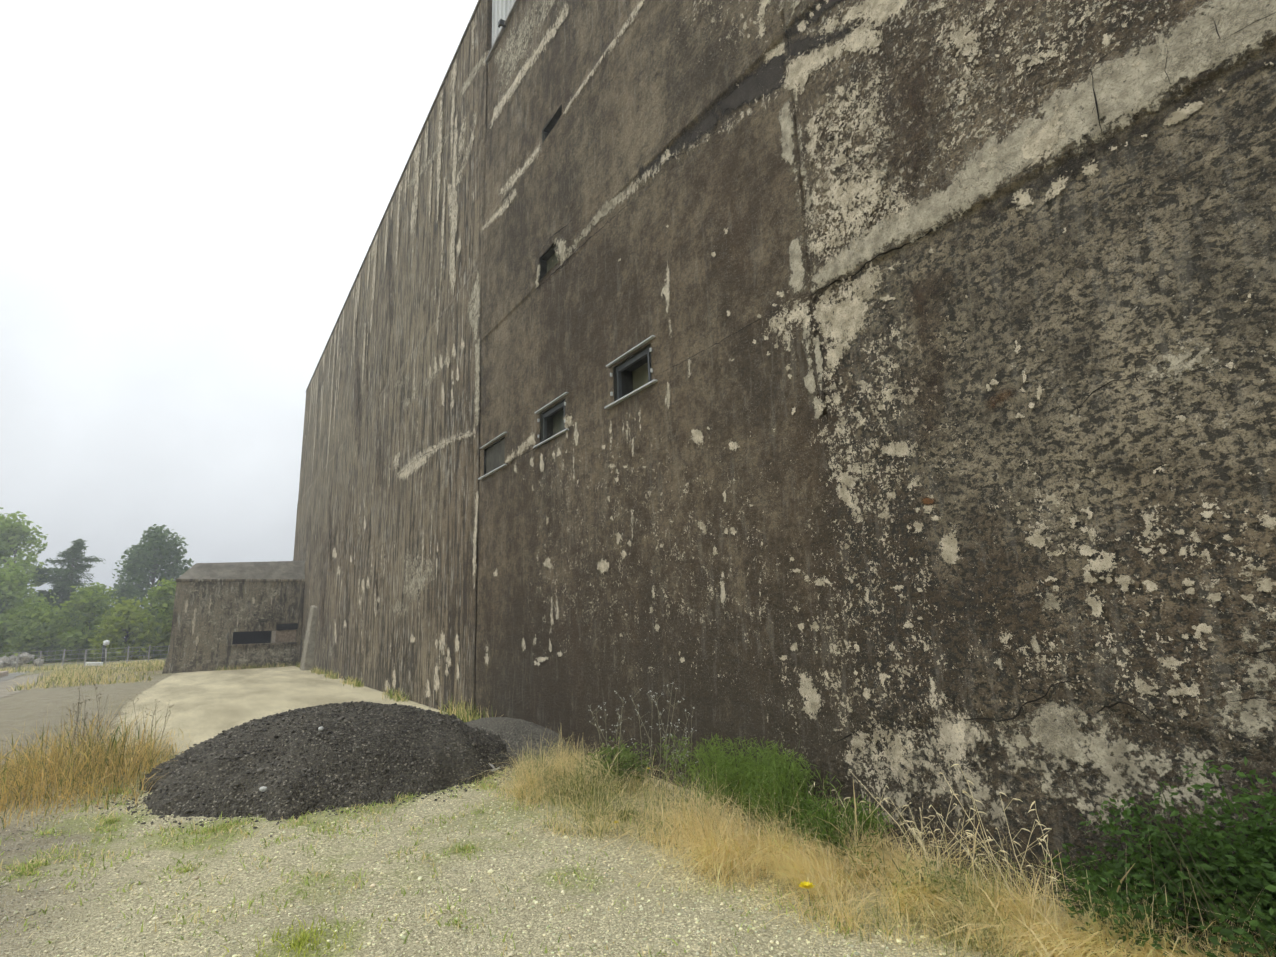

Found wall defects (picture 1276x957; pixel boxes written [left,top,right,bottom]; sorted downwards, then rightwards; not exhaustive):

leakage [621,0,849,203]
leakage [980,139,1116,219]
leakage [909,661,1016,801]
crack [964,681,1082,722]
crack [1096,702,1150,720]